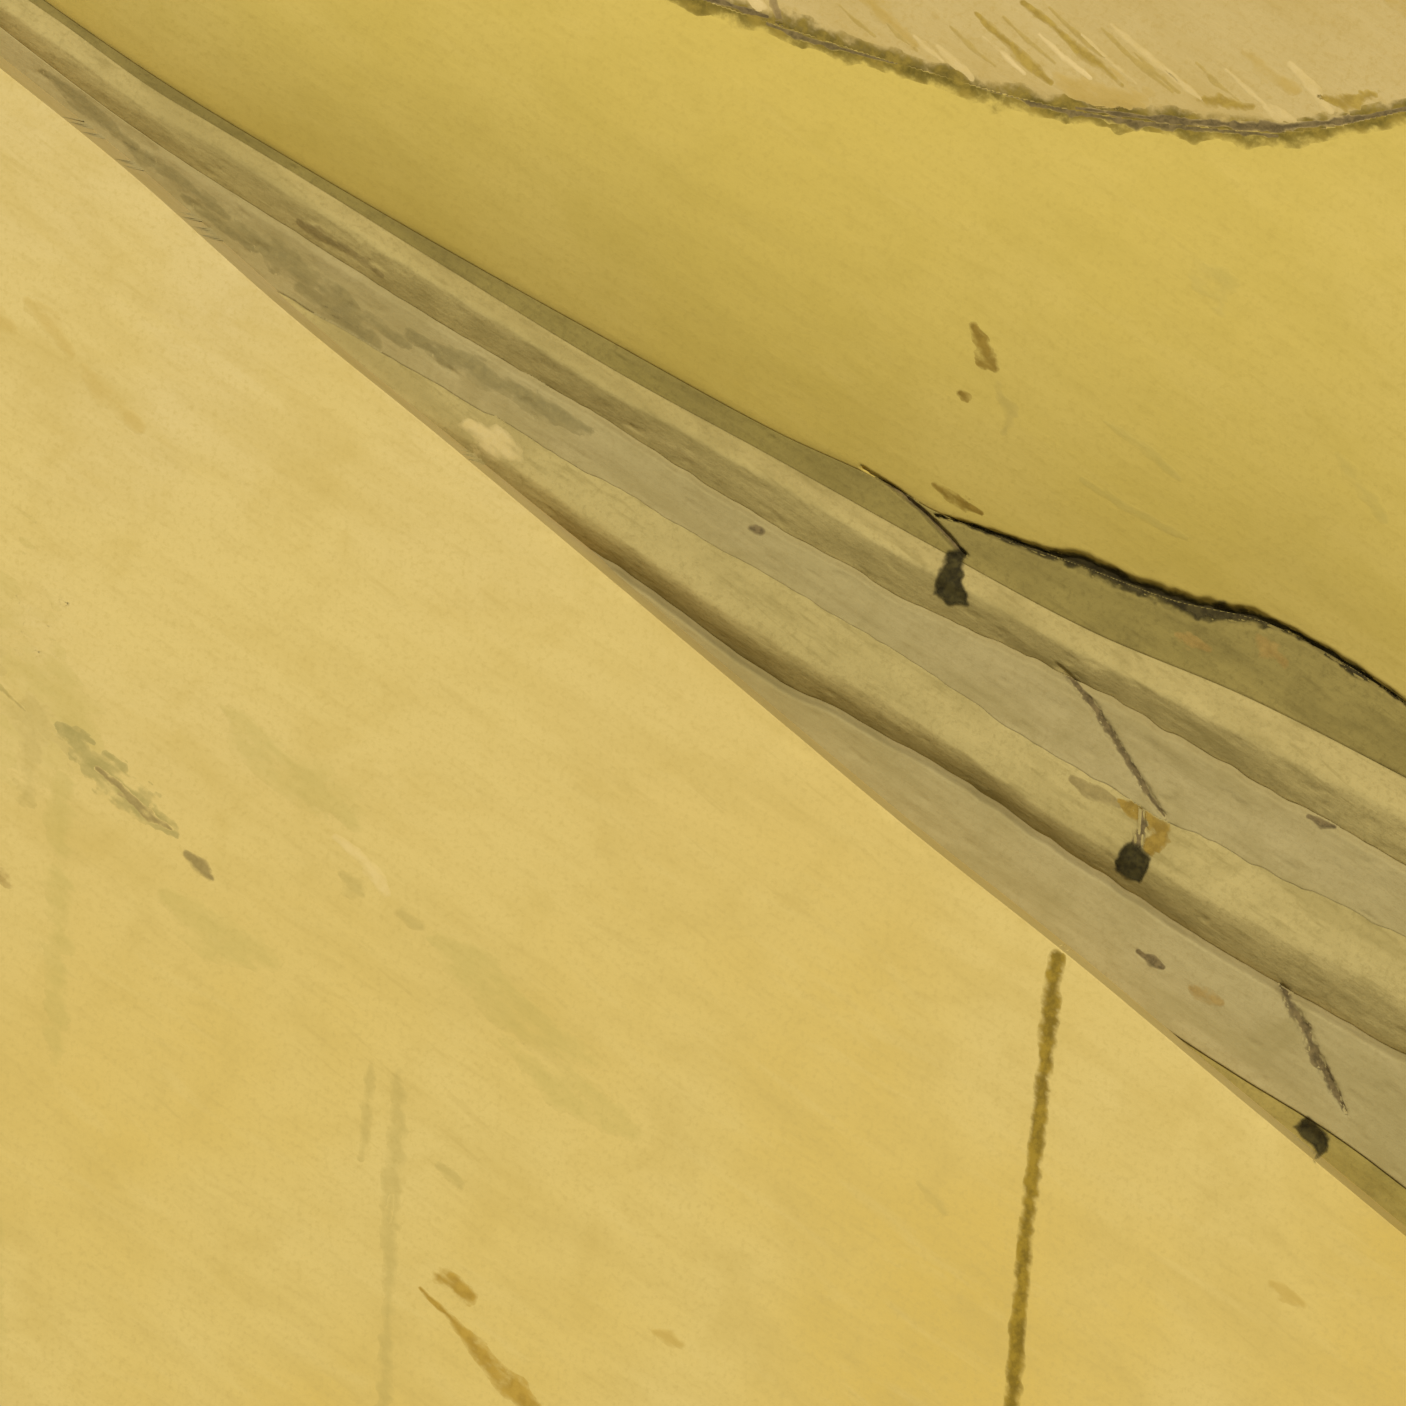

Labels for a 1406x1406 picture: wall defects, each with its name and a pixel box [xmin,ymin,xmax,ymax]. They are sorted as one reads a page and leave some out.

spalling [747,0,768,12]
crack [667,0,1406,150]
peeling [838,0,1381,123]
crack [875,477,1406,705]
water stain [0,570,107,1067]
crack [1061,673,1167,851]
rust [1068,775,1171,857]
crack [1275,983,1349,1115]